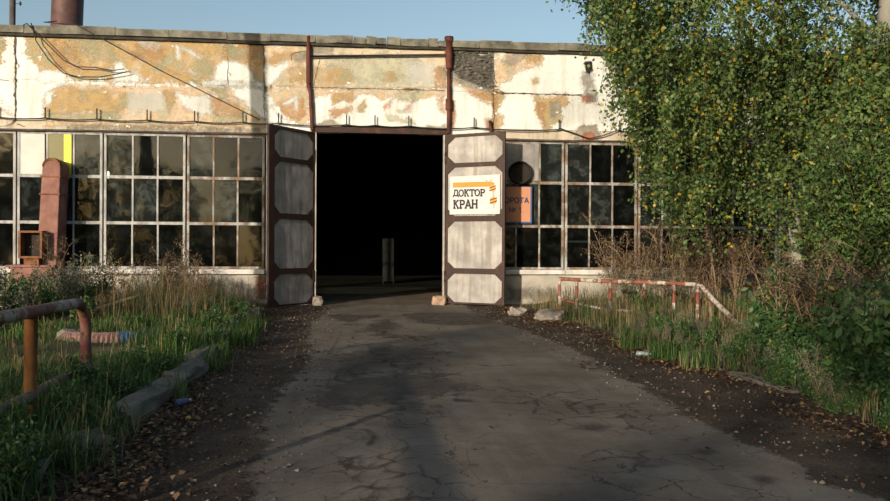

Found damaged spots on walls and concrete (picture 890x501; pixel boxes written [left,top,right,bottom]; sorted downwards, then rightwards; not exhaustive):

peeling [24,37,544,130]
peeling [533,93,570,132]